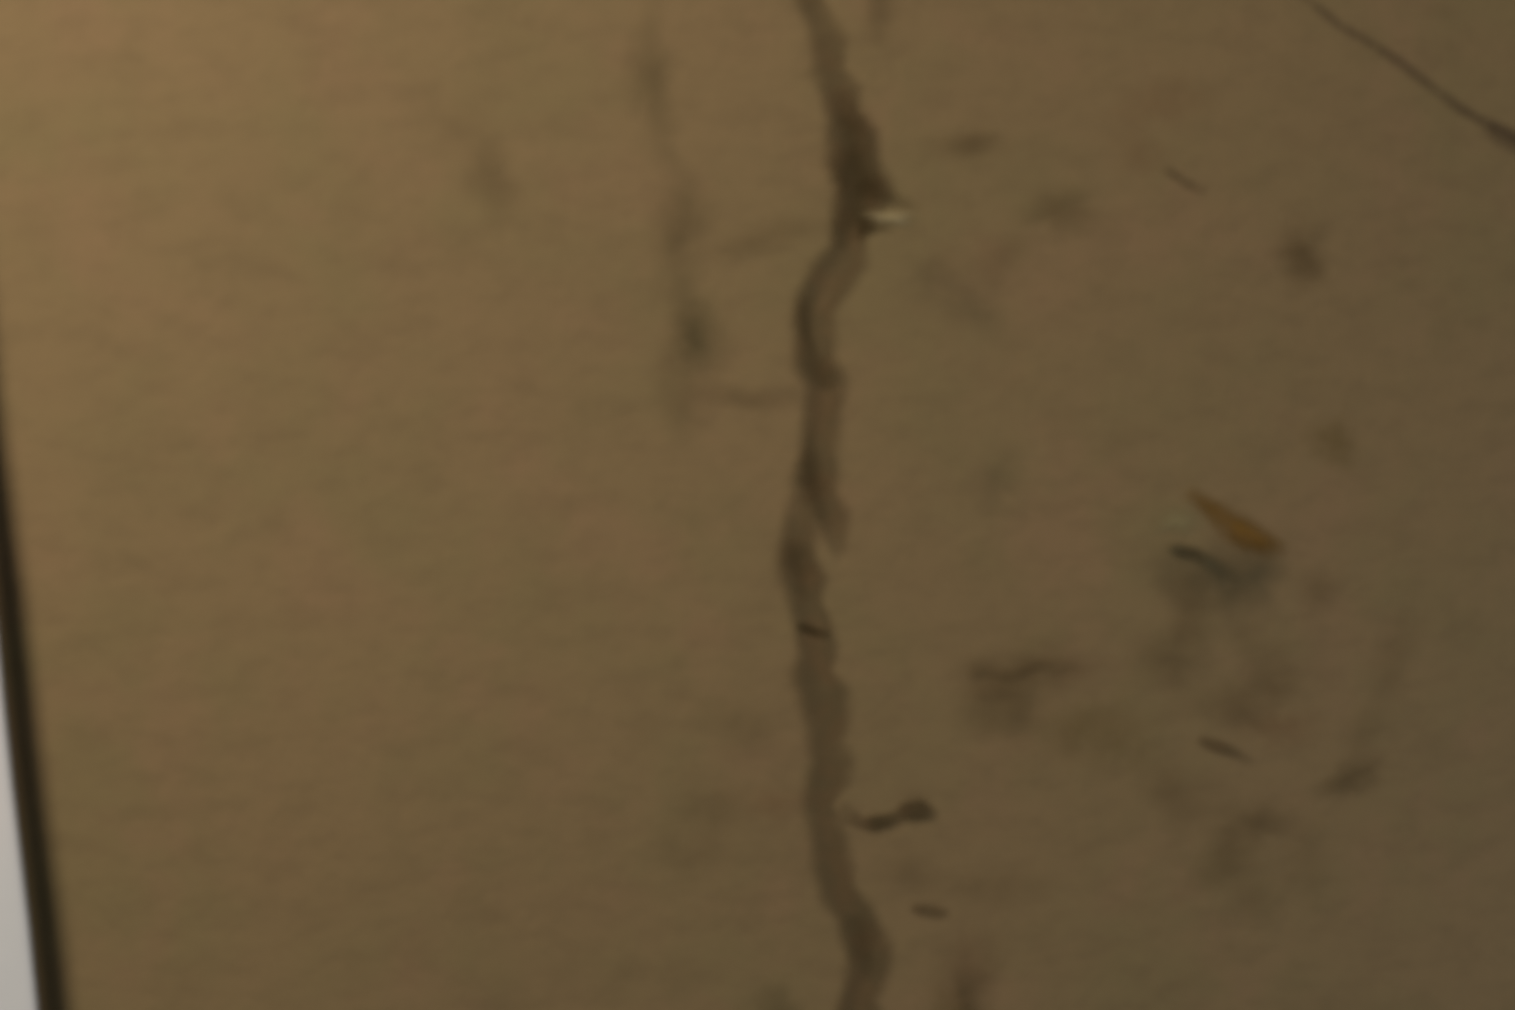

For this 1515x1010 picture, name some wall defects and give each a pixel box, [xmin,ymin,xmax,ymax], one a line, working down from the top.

crack [784,0,933,1010]